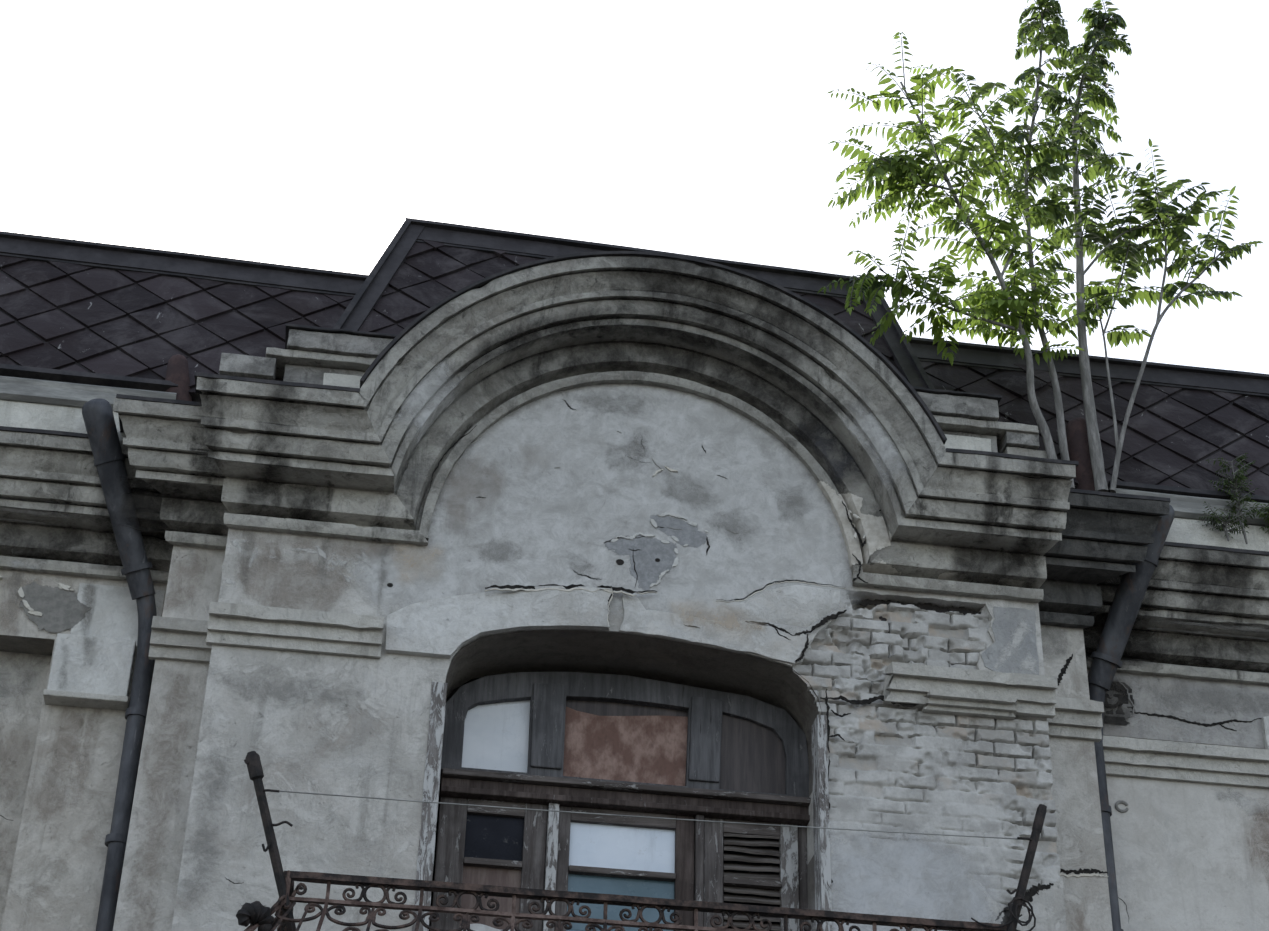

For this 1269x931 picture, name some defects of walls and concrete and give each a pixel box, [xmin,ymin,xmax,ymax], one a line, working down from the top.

damp [400,367,454,442]
damp [474,258,862,483]
damp [243,384,326,522]
peeling [18,582,91,633]
crack [485,536,657,630]
peeling [604,513,709,590]
crack [718,580,847,662]
spalling [842,501,868,583]
damp [956,454,1052,588]
flaking render [792,595,1060,913]
crack [1130,711,1262,731]
crack [995,868,1129,924]